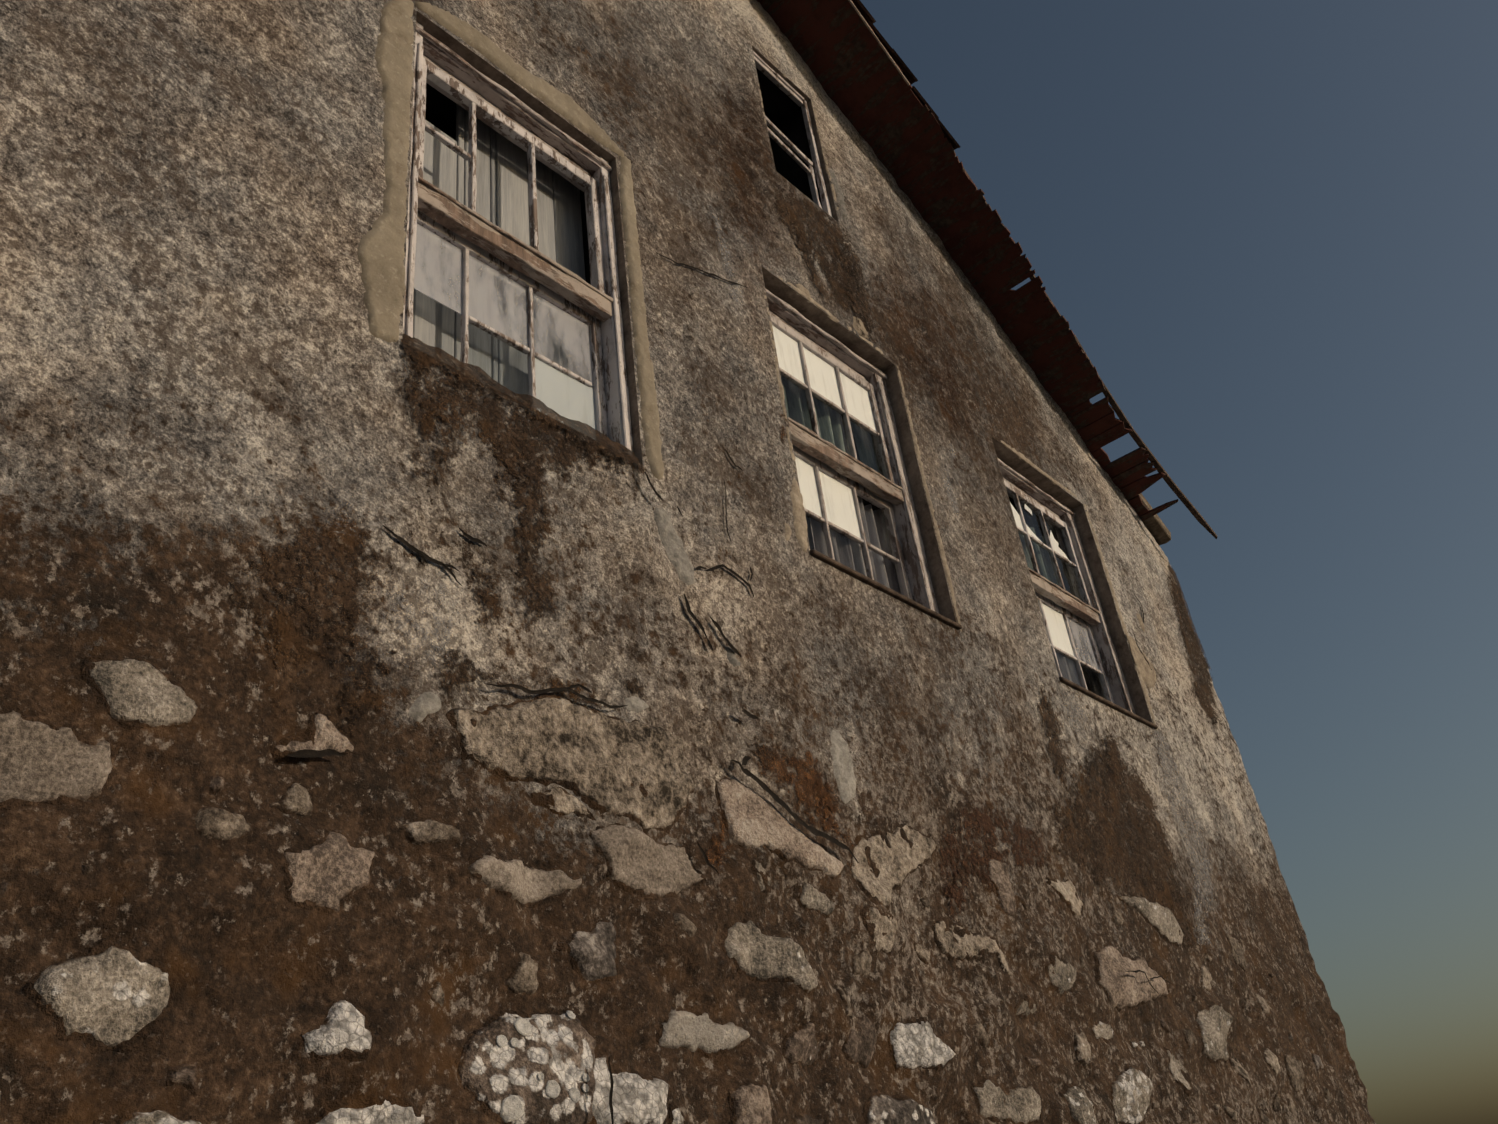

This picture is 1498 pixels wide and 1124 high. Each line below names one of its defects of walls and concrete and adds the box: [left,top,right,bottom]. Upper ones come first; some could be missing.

damp [399,368,472,487]
crack [383,525,487,586]
damp [468,438,570,635]
spalling [0,654,201,810]
crack [484,683,628,708]
spalling [409,692,707,908]
crack [742,709,758,719]
crack [731,756,858,863]
spalling [715,776,937,956]
damp [1103,733,1126,784]
spalling [21,939,179,1054]
spalling [455,1006,687,1124]